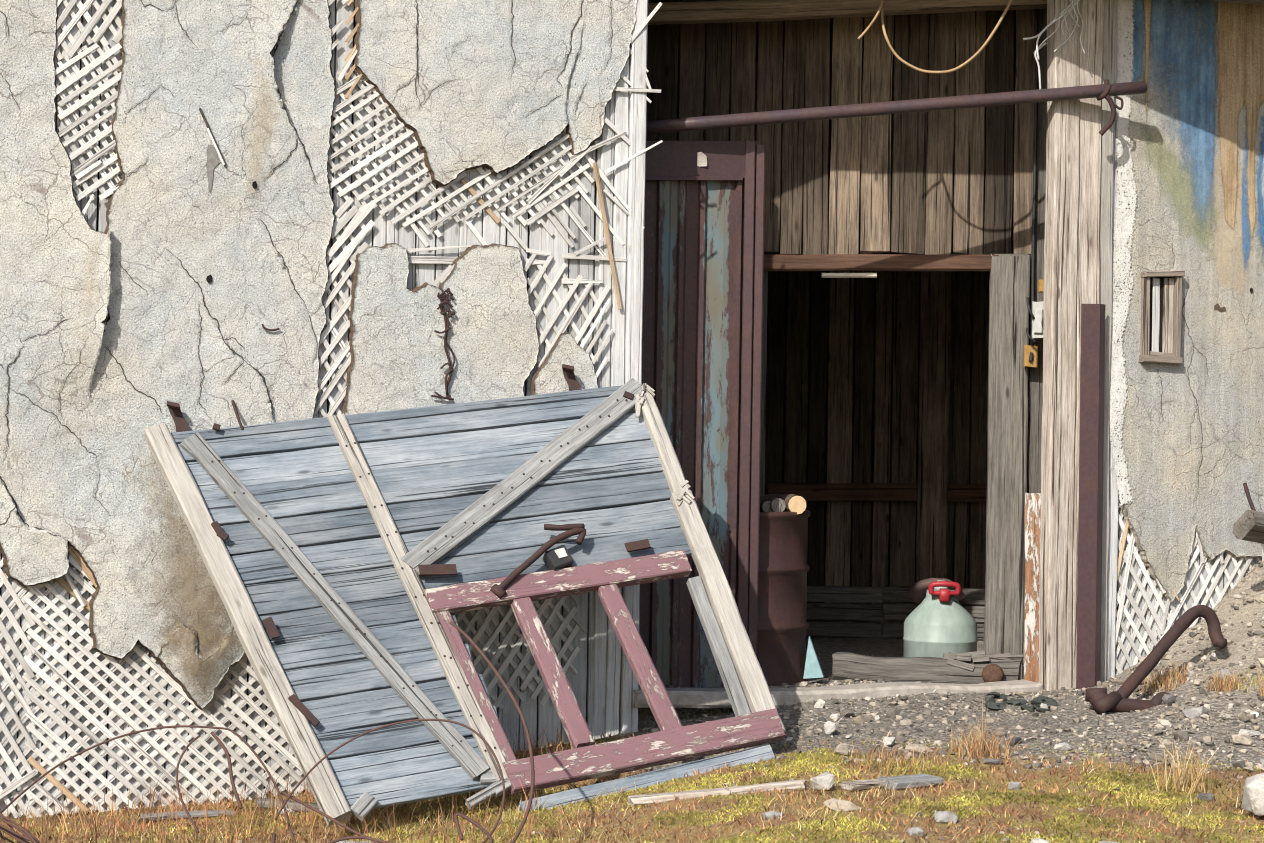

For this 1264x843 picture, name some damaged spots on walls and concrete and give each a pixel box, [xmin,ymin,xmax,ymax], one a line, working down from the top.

crack [0,318,164,540]
flaking render [53,0,125,234]
crack [141,0,248,46]
crack [161,249,273,419]
crack [258,218,322,362]
crack [268,0,318,185]
flaking render [312,0,663,419]
flaking render [1109,0,1264,677]
crack [1157,243,1233,520]
water stain [1130,0,1264,284]
flaking render [0,540,310,826]
spalling [892,808,1054,843]